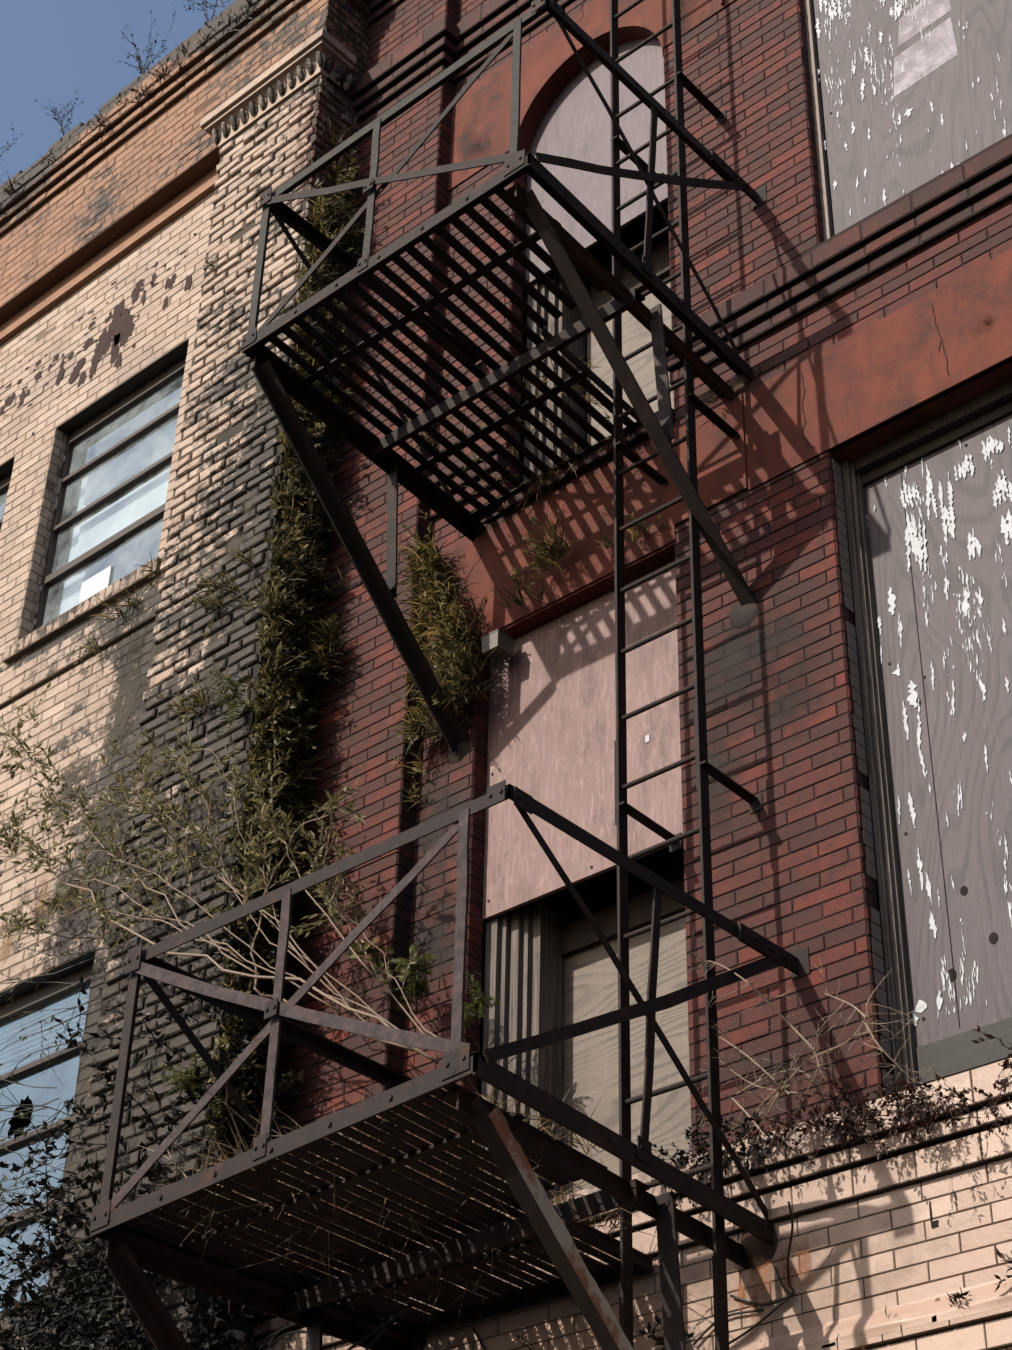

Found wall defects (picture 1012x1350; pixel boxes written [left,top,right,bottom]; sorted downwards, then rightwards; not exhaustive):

peeling [815,0,944,167]
peeling [972,77,1006,137]
peeling [0,228,196,417]
peeling [877,426,1012,793]
peeling [898,792,916,829]
peeling [907,847,955,939]
peeling [946,780,963,828]
peeling [986,801,1012,924]
peeling [912,918,988,1026]